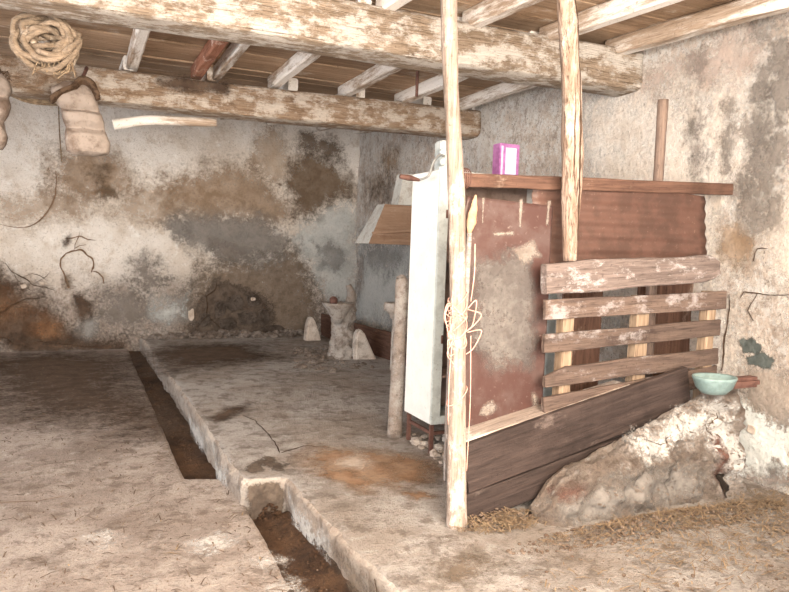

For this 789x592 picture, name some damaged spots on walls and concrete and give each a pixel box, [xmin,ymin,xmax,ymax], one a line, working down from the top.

leakage [1,126,354,240]
leakage [643,19,789,269]
crack [0,232,104,314]
leakage [316,241,345,270]
leakage [0,240,325,446]
crack [721,291,782,371]